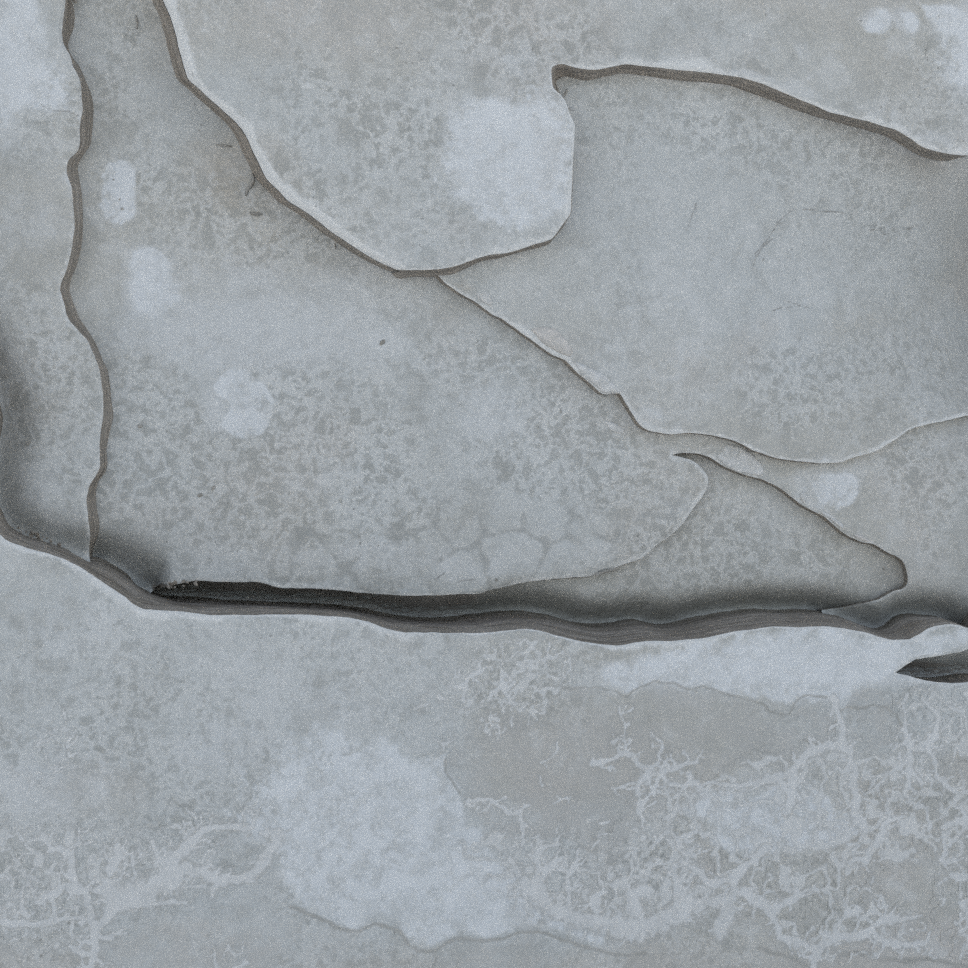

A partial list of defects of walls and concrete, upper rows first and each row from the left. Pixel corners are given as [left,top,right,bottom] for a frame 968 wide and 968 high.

flaking render [0,0,968,628]
crack [0,0,968,683]
flaking render [895,649,968,677]